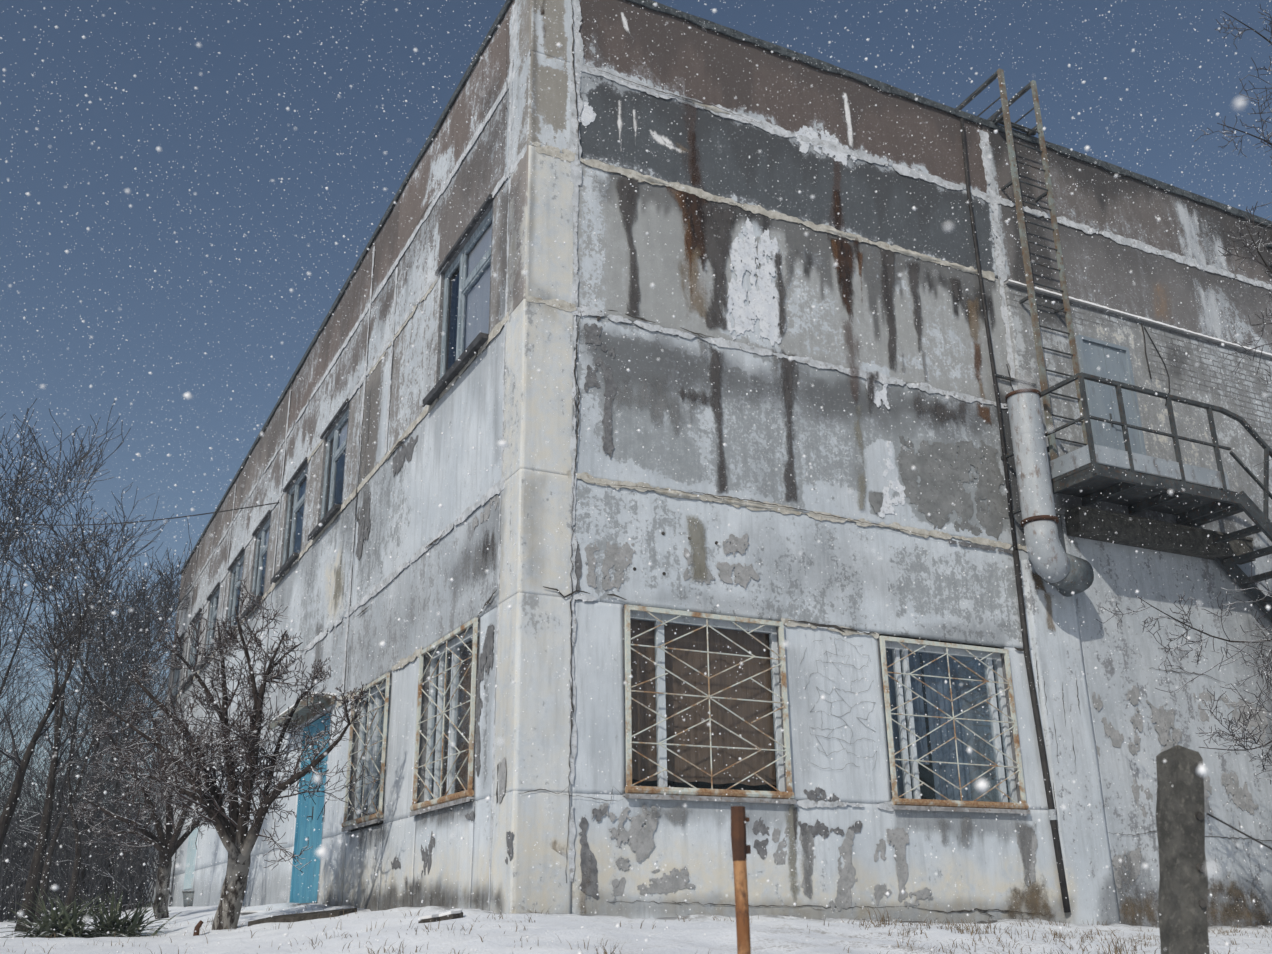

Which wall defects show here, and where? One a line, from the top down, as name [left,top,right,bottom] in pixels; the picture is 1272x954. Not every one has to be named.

damp [616,177,640,317]
damp [615,203,735,493]
rust [667,133,709,320]
damp [773,251,798,502]
rust [827,191,862,318]
damp [867,248,927,411]
rust [858,475,866,510]
crack [496,310,941,883]
peeling [475,624,494,777]
peeling [579,803,695,899]
peeling [752,817,863,911]
peeling [874,827,933,908]